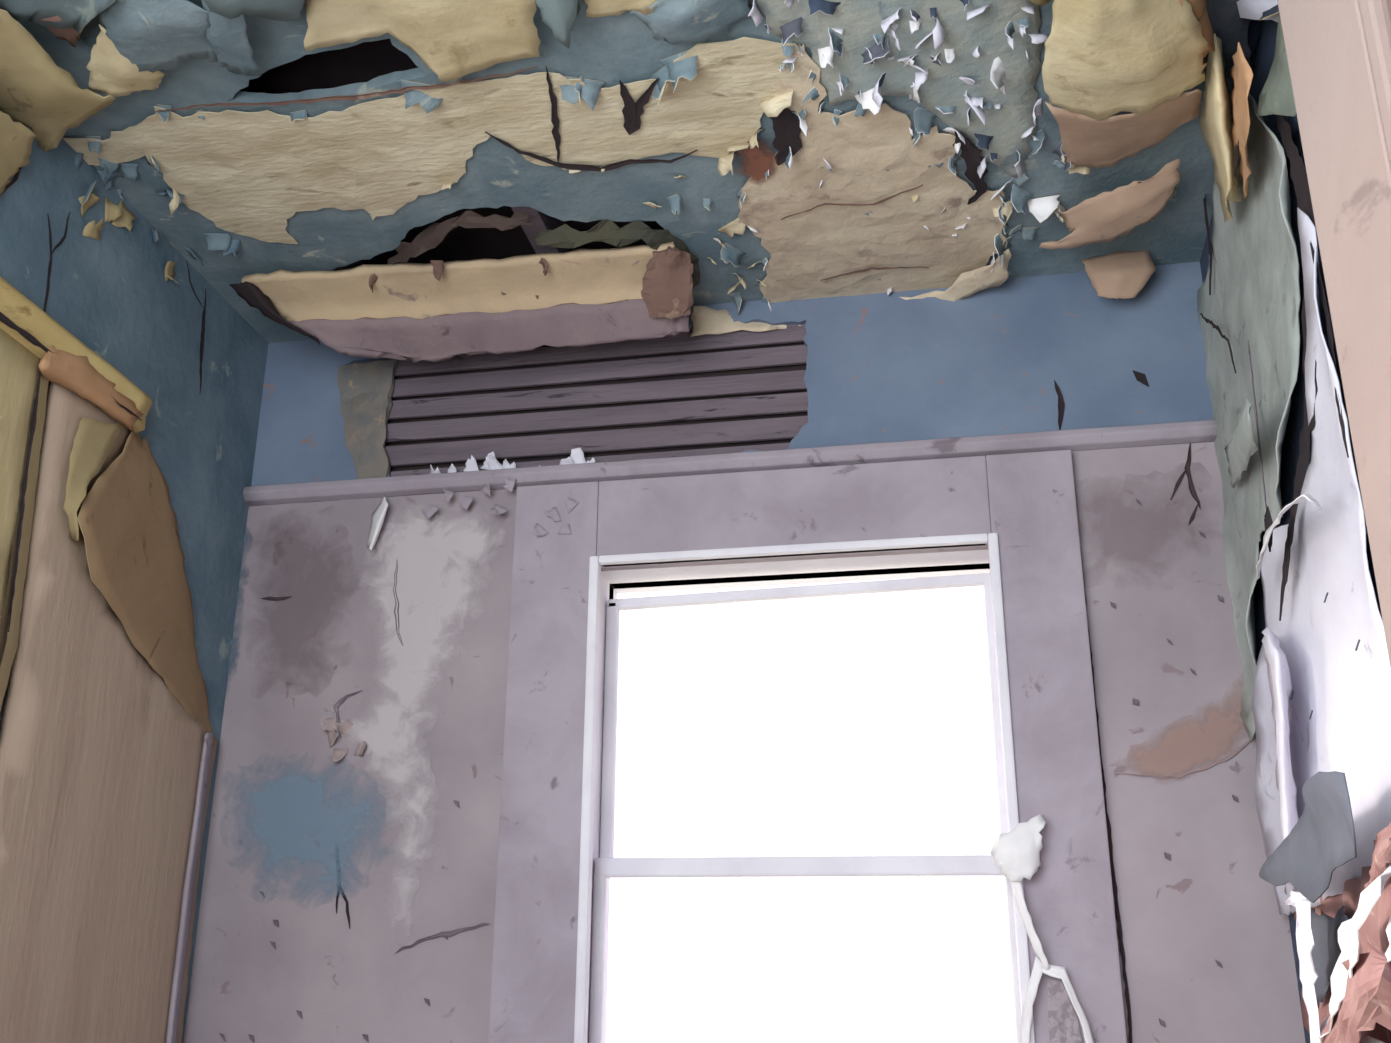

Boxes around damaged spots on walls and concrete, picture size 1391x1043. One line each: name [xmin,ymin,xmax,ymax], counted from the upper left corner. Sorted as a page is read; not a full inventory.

peeling [0,0,307,76]
peeling [1203,0,1279,95]
flaking render [63,0,1091,315]
crack [1170,443,1201,525]